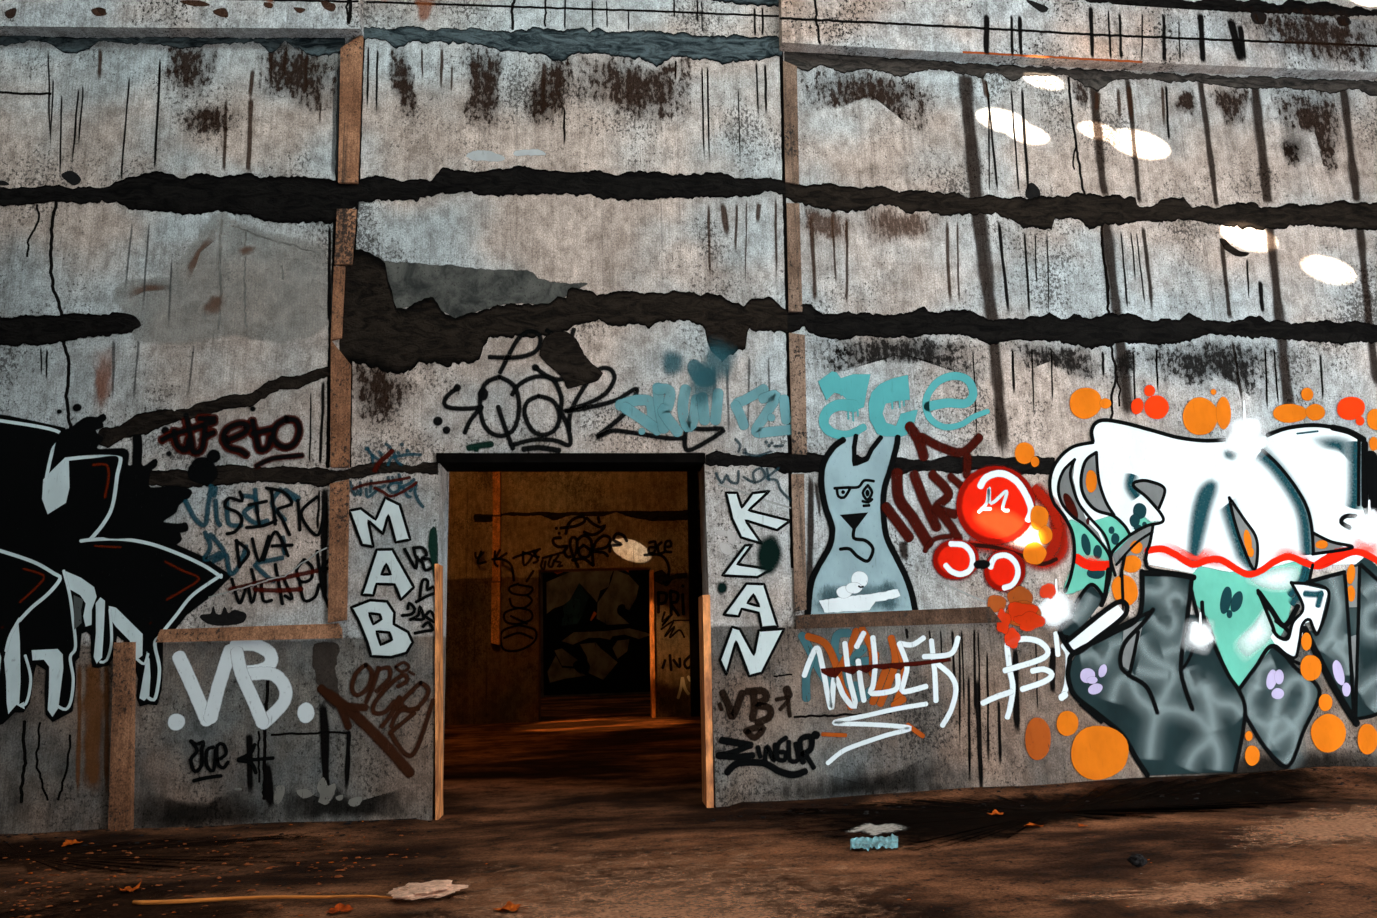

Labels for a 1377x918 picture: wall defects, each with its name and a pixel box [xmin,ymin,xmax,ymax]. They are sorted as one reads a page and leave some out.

crack [0,89,52,97]
spalling [61,171,81,186]
damp [523,53,710,156]
damp [1011,89,1029,190]
spalling [1025,183,1041,199]
damp [1072,82,1108,194]
damp [1117,80,1142,202]
damp [1161,82,1360,206]
crack [26,201,73,428]
crack [217,0,1377,568]
damp [1101,224,1153,315]
damp [1246,228,1285,321]